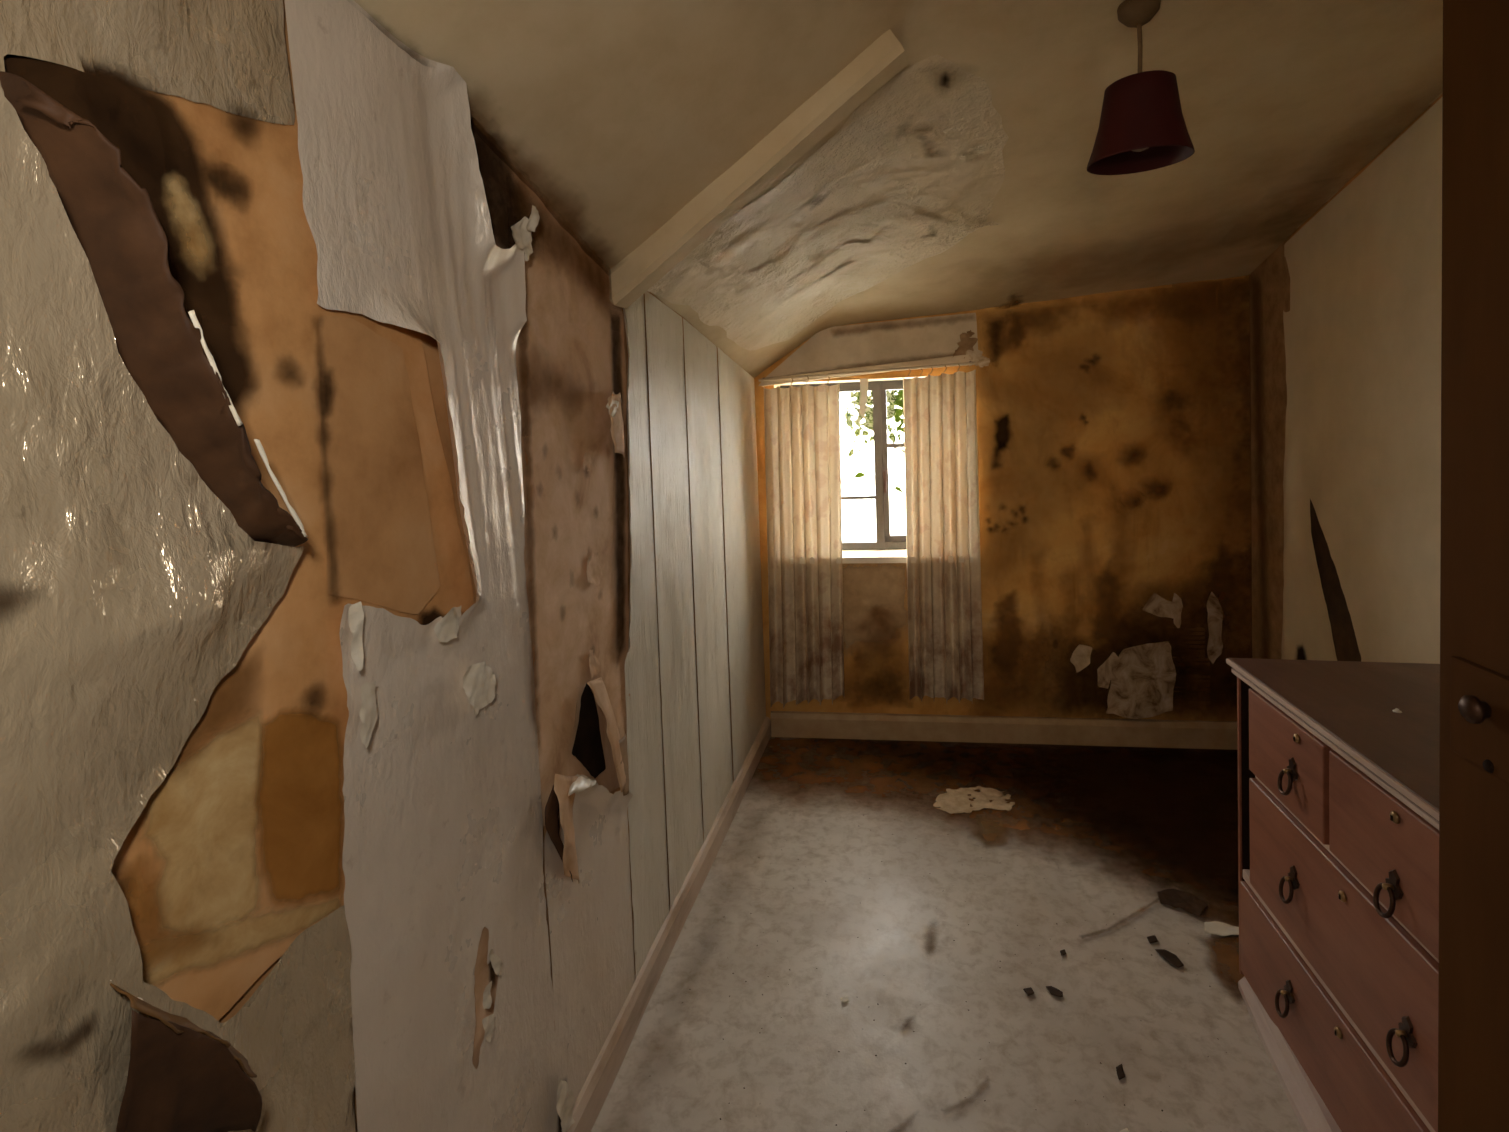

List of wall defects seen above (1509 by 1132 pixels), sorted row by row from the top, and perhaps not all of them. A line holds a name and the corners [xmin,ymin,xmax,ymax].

peeling [471,121,630,827]
leakage [993,415,1010,467]
peeling [348,601,377,748]
peeling [434,606,462,642]
peeling [463,661,496,715]
leakage [980,549,1252,720]
peeling [110,980,263,1132]
spalling [472,926,502,1069]